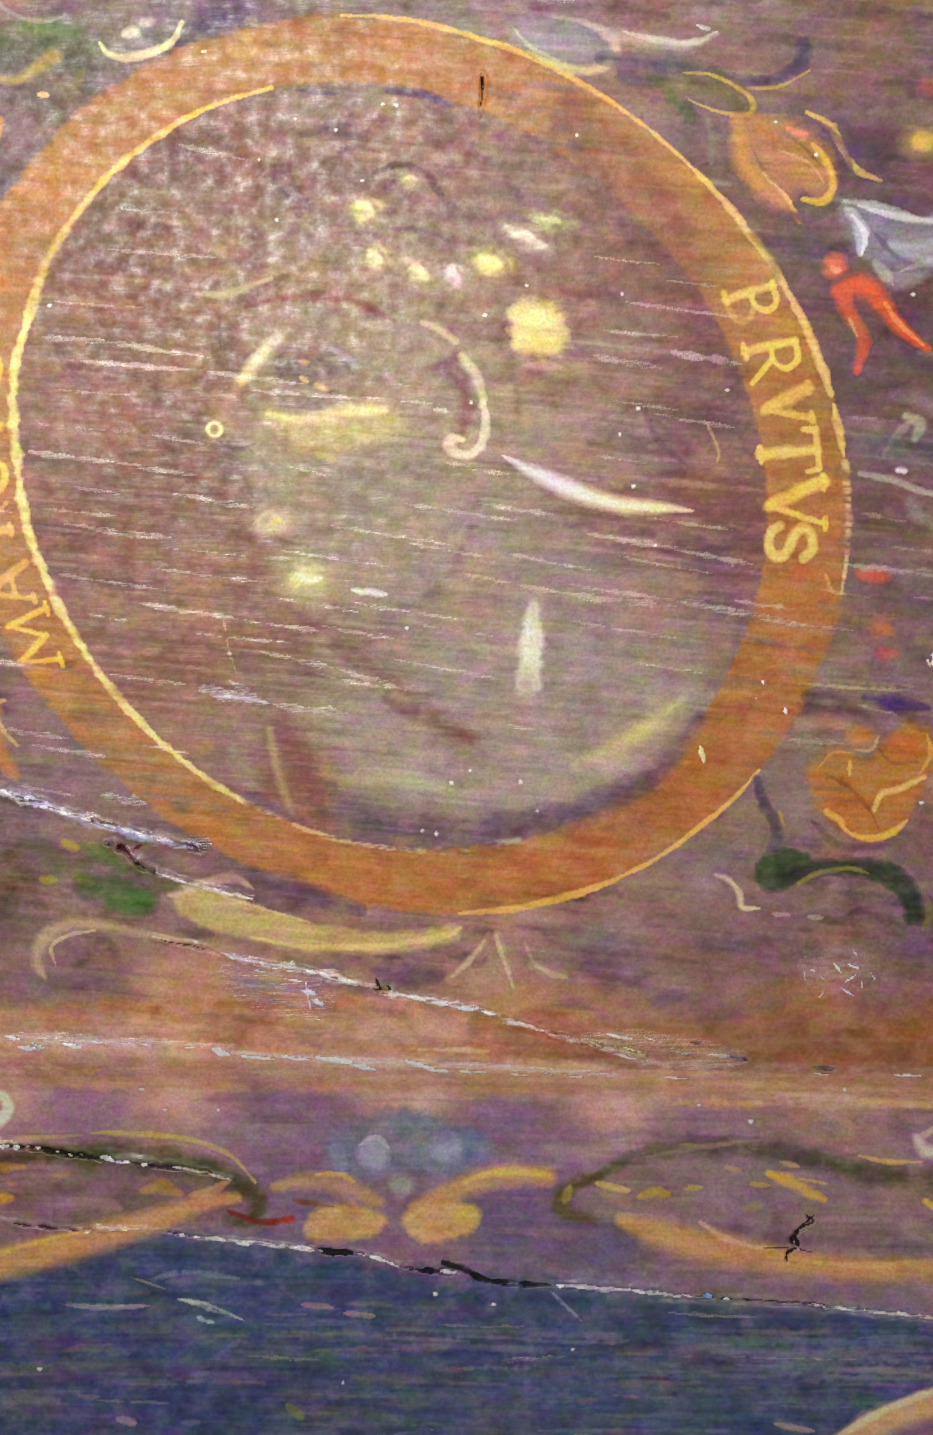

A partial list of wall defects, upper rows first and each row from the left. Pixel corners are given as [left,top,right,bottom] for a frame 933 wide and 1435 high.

crack [0,788,253,901]
crack [161,939,645,1056]
crack [0,1139,233,1181]
crack [13,1215,933,1319]